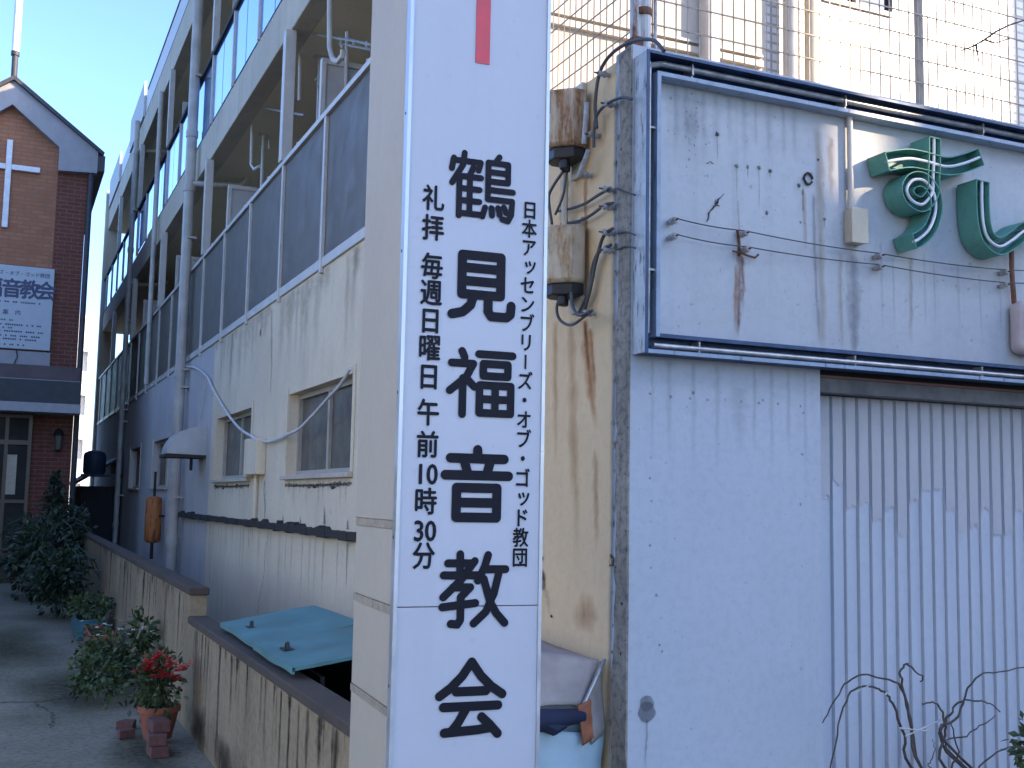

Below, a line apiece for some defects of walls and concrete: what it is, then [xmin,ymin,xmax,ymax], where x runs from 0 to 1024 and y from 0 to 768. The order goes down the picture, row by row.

rust [584,328,594,395]
leakage [259,681,324,768]